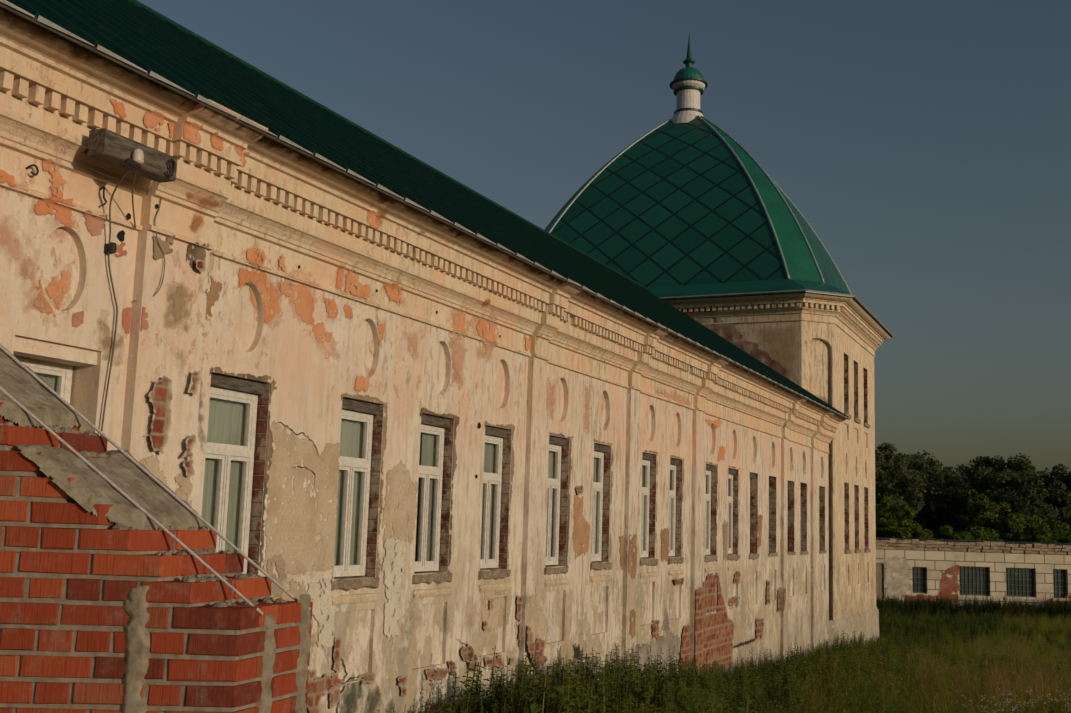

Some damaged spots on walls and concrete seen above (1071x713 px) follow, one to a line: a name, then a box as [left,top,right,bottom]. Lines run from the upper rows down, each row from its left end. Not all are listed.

peeling [34,159,106,236]
peeling [114,213,131,258]
peeling [239,248,405,359]
flaking render [139,376,196,506]
peeling [187,367,376,713]
peeling [341,376,418,638]
flaking render [549,432,584,568]
flaking render [652,620,660,639]
flaking render [679,571,741,676]
peeling [884,556,961,609]